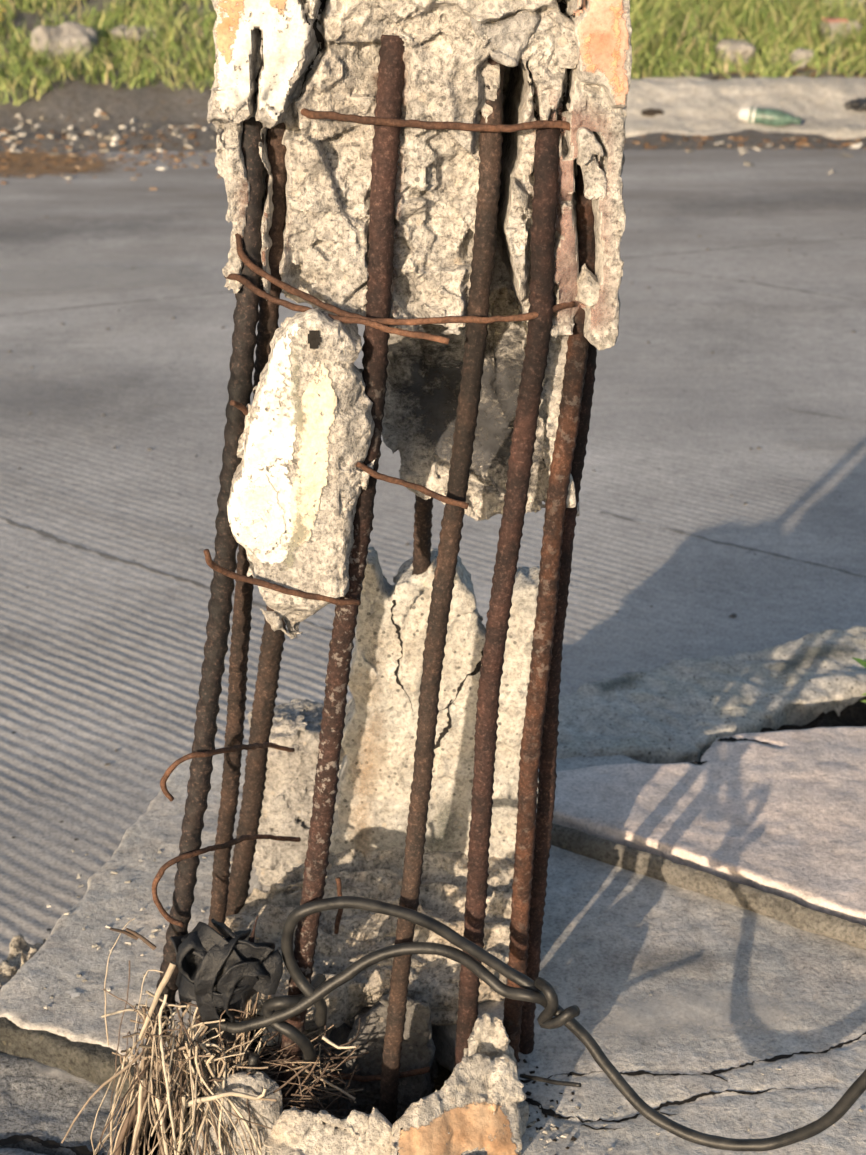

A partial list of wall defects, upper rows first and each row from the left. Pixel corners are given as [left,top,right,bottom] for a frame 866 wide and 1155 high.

corrosion [549,110,597,321]
spalling [0,0,629,1155]
crack [391,600,483,749]
crack [0,1135,98,1155]
crack [519,1032,866,1130]